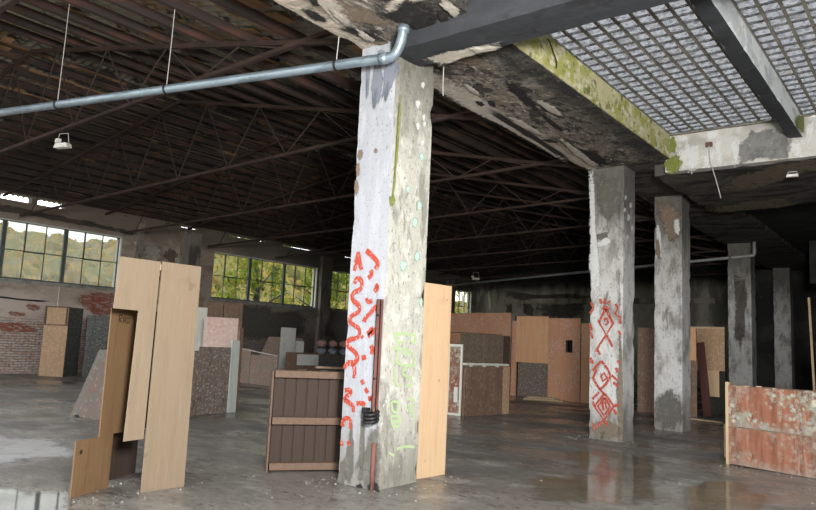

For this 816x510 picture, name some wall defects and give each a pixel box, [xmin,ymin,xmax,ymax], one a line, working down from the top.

spalling [317,0,460,46]
peeling [421,76,601,169]
peeling [738,129,791,164]
flaking render [0,304,40,333]
flaking render [79,291,115,316]
water stain [655,389,683,430]